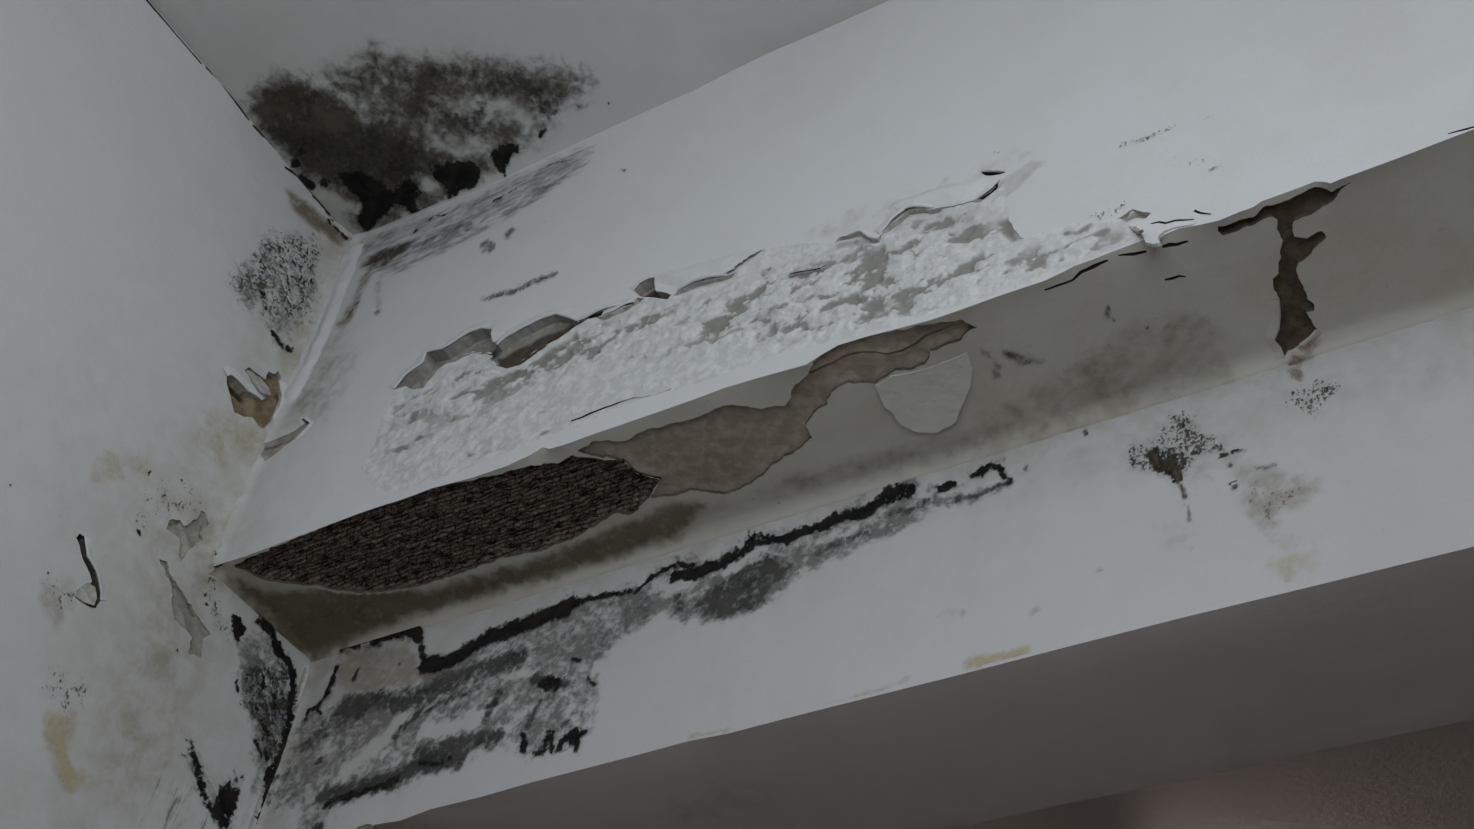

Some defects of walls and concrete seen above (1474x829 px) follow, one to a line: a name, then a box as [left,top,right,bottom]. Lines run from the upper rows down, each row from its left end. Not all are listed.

leakage [229,52,580,352]
flaking render [389,306,589,390]
flaking render [630,273,671,300]
flaking render [1129,221,1197,247]
flaking render [1218,183,1350,359]
flaking render [222,320,976,593]
leakage [1127,411,1242,515]
leakage [181,462,1027,829]